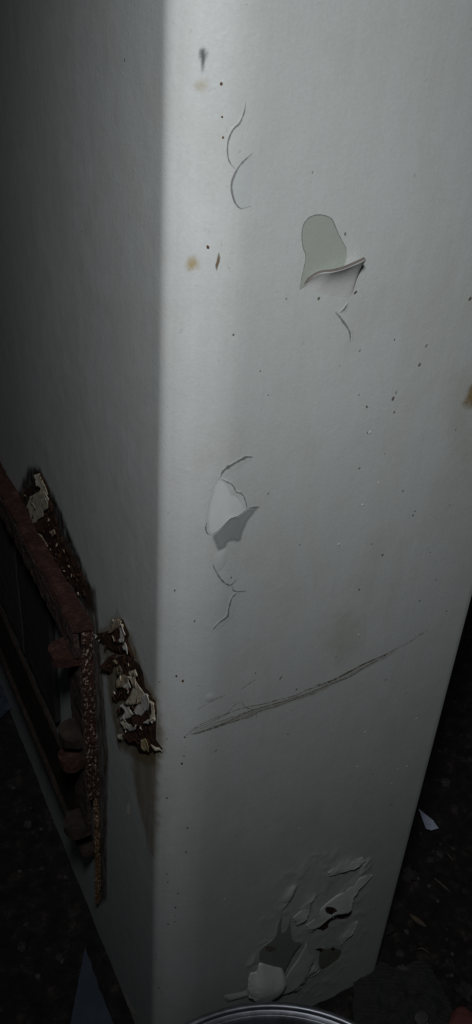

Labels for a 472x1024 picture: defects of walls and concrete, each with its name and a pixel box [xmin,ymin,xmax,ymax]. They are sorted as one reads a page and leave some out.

peeling [300,214,366,352]
peeling [205,455,256,630]
corrosion [19,468,167,901]
peeling [223,846,379,1004]